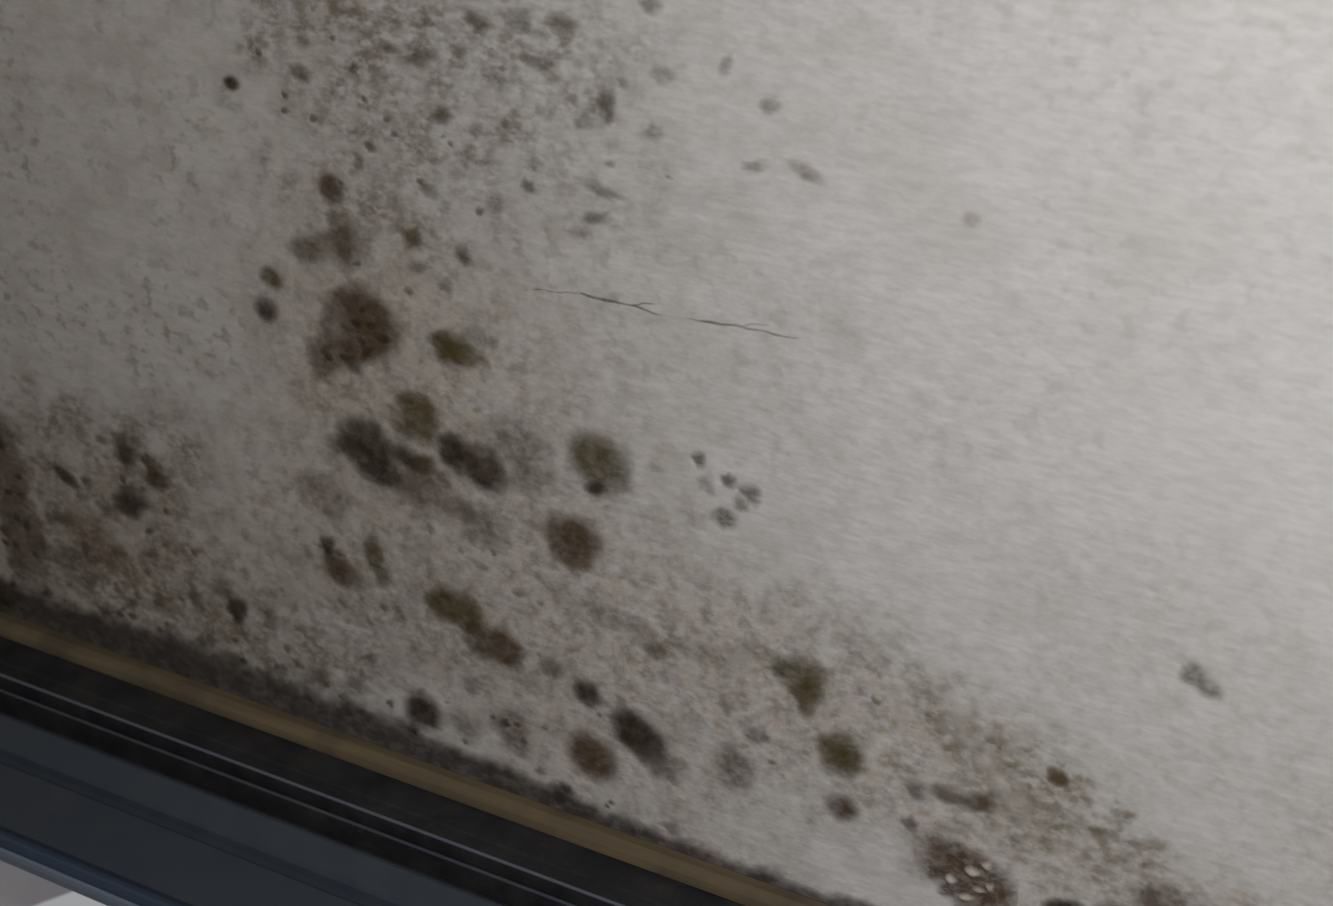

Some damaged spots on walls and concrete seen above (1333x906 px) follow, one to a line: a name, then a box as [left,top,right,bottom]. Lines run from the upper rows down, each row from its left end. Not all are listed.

damp [327,0,442,71]
damp [225,77,238,89]
damp [321,175,340,198]
damp [263,269,280,287]
damp [258,302,275,319]
damp [299,289,404,410]
damp [418,332,474,378]
damp [336,381,505,507]
damp [0,427,867,906]
damp [610,611,947,829]
damp [939,790,1025,816]
damp [1043,770,1089,804]